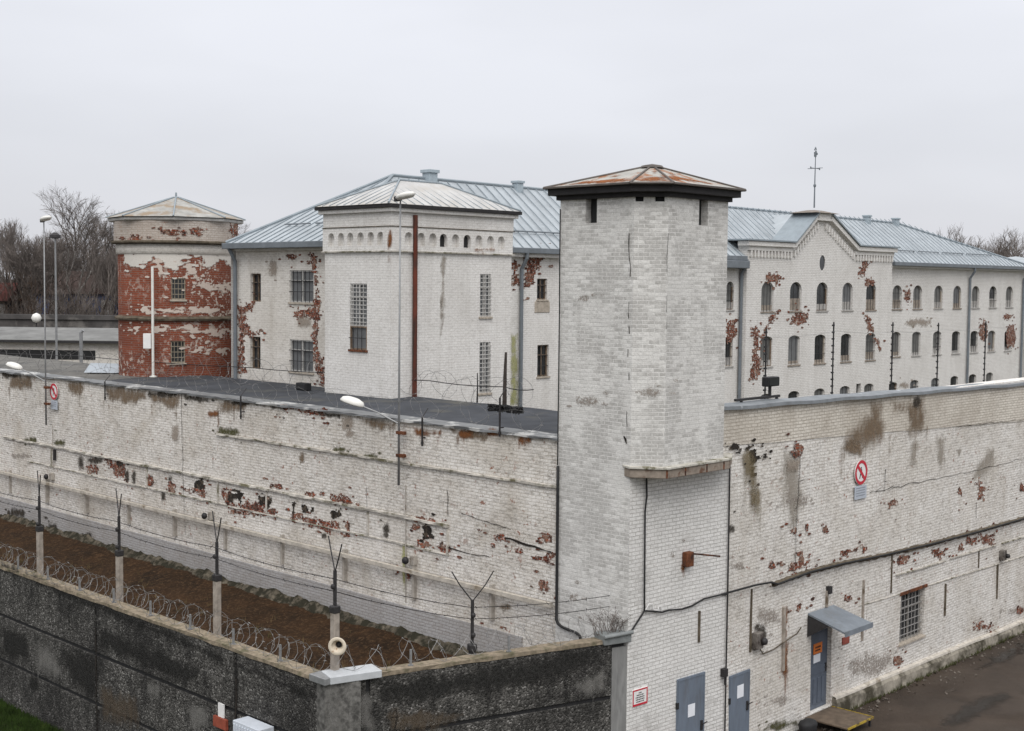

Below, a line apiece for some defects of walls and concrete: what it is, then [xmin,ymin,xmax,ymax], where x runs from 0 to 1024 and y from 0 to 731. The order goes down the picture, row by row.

rust [574,171,711,184]
peeling [120,254,266,377]
spalling [265,252,325,386]
spalling [726,303,810,385]
damp [844,404,891,459]
damp [895,395,928,462]
spalling [78,453,359,538]
crack [436,492,551,557]
spalling [477,529,556,599]
damp [743,452,760,510]
damp [785,456,801,520]
spalling [761,523,829,577]